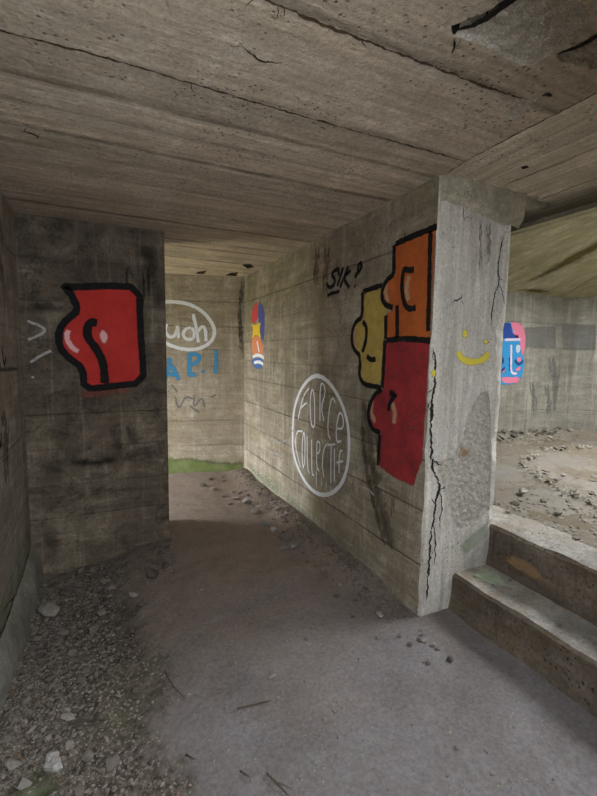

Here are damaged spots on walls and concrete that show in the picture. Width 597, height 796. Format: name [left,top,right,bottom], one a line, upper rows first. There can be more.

crack [0,30,597,174]
crack [246,0,526,99]
spalling [449,0,597,70]
crack [426,349,445,600]
spalling [435,391,492,532]